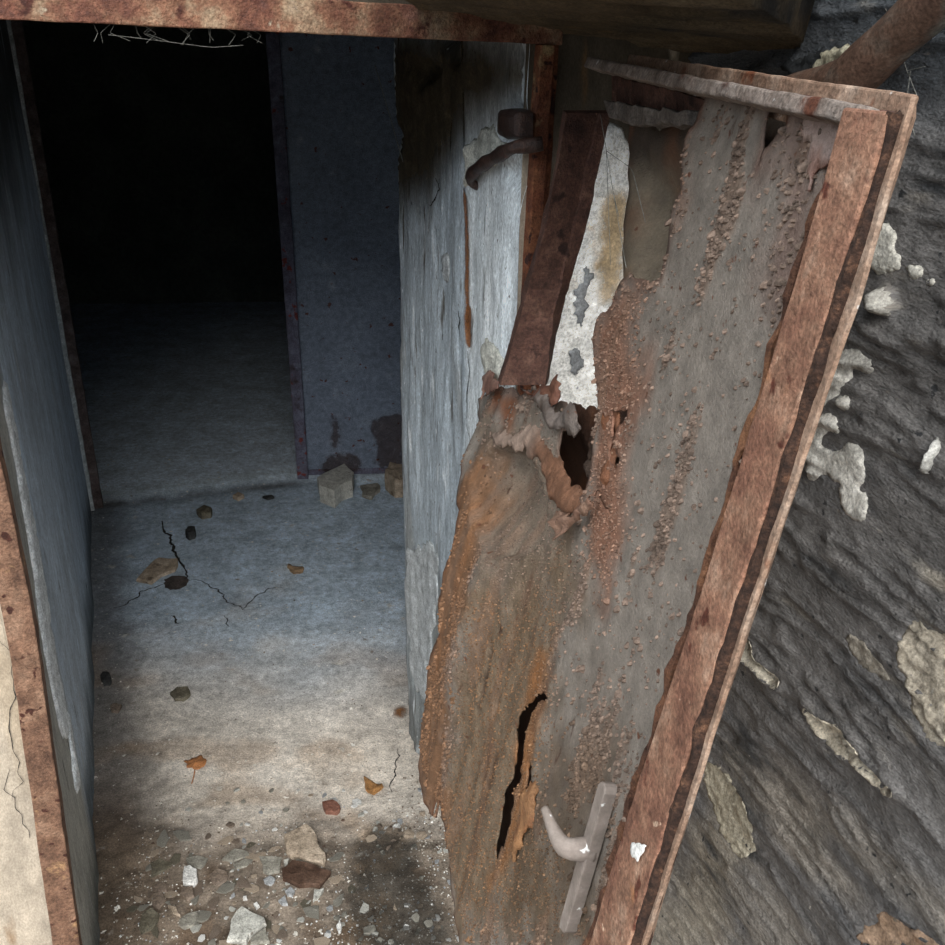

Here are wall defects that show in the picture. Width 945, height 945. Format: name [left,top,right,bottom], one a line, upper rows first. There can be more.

peeling [521,123,630,486]
crack [162,521,282,626]
rust [418,105,826,945]
crack [2,644,30,838]
flaking render [703,762,756,858]
flaking render [740,640,779,690]
flaking render [802,708,892,798]
flaking render [896,620,945,747]